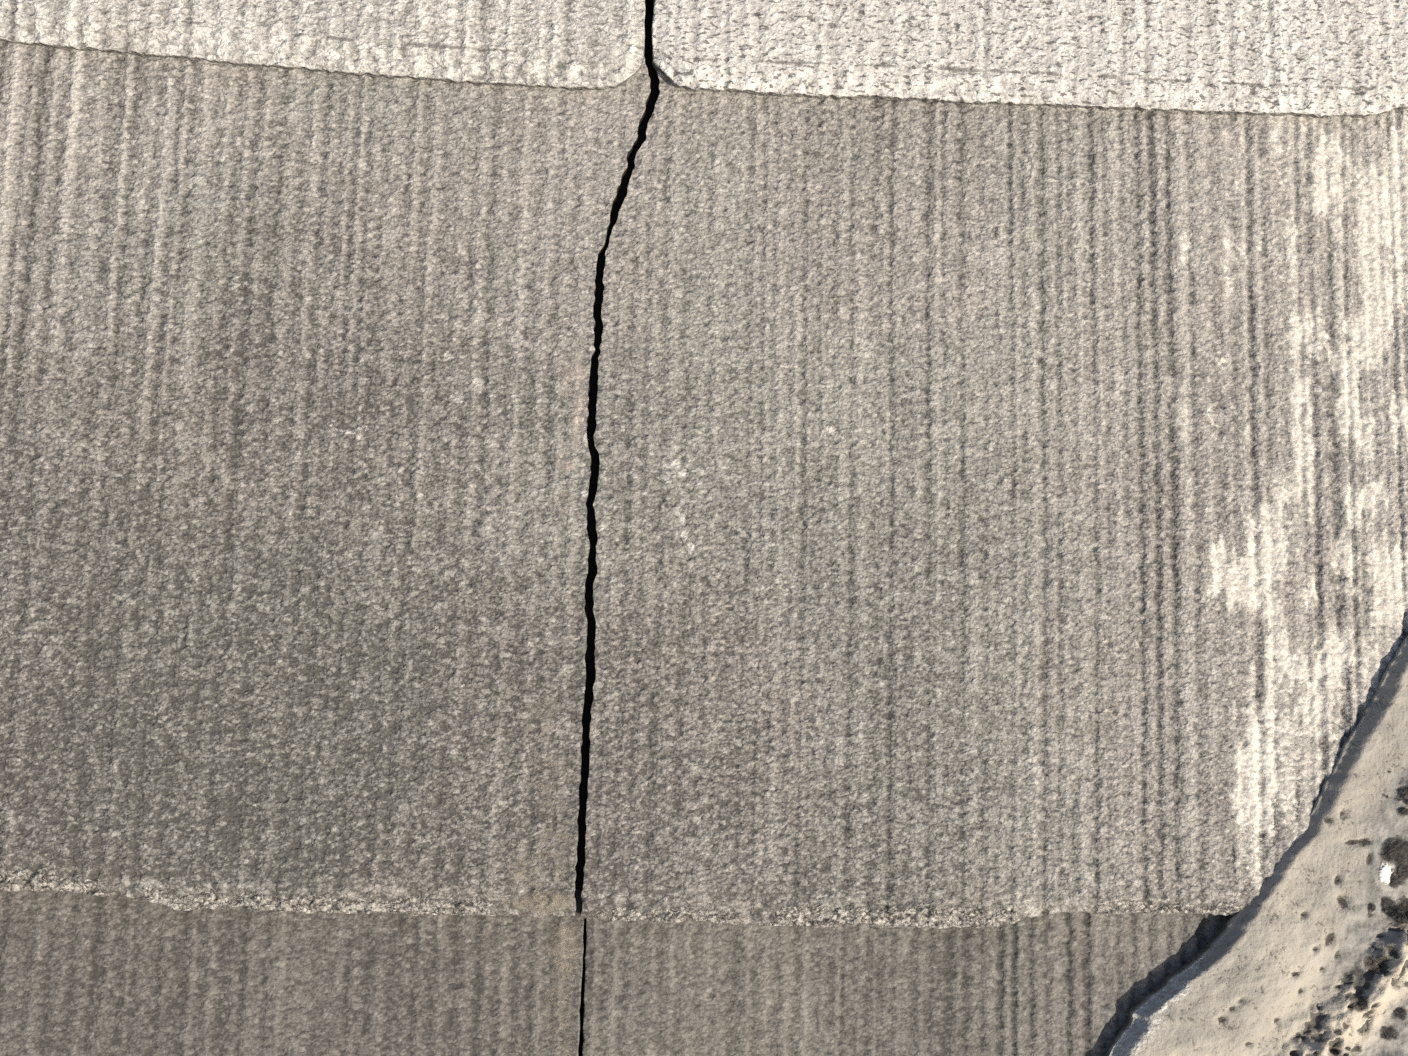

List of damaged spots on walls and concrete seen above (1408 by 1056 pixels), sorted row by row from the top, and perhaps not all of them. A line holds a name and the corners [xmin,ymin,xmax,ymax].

crack [293,33,353,41]
crack [407,44,509,52]
crack [946,67,1057,75]
peeling [1178,225,1197,273]
peeling [1167,348,1190,452]
crack [483,0,660,917]
peeling [1195,112,1408,890]
spalling [1092,897,1250,916]
spalling [1369,946,1408,987]
spalling [1354,997,1375,1018]